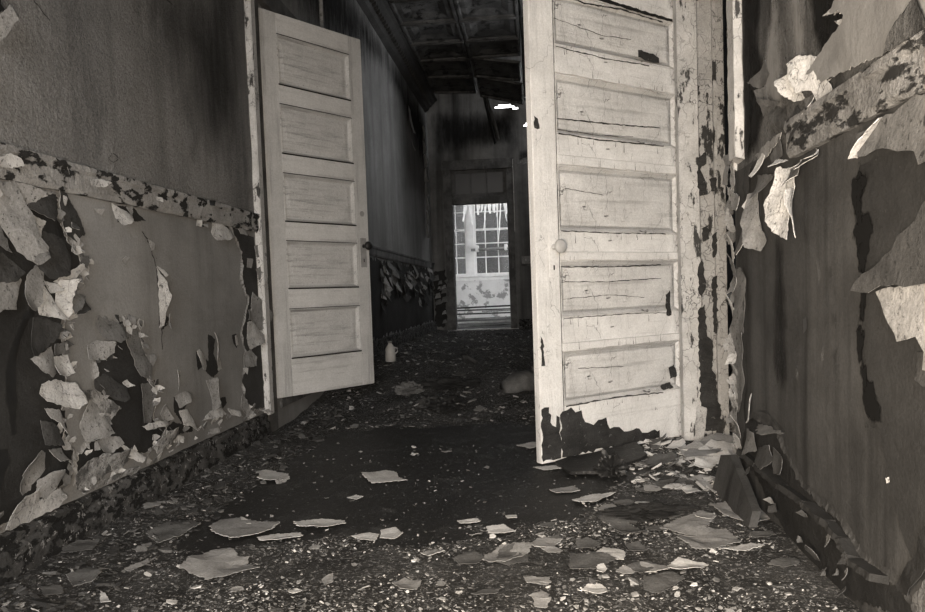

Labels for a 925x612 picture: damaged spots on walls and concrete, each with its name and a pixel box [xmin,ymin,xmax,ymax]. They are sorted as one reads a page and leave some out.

spalling [0,153,25,169]
peeling [369,257,447,340]
peeling [694,0,925,612]
peeling [0,179,274,534]
peeling [535,407,660,470]